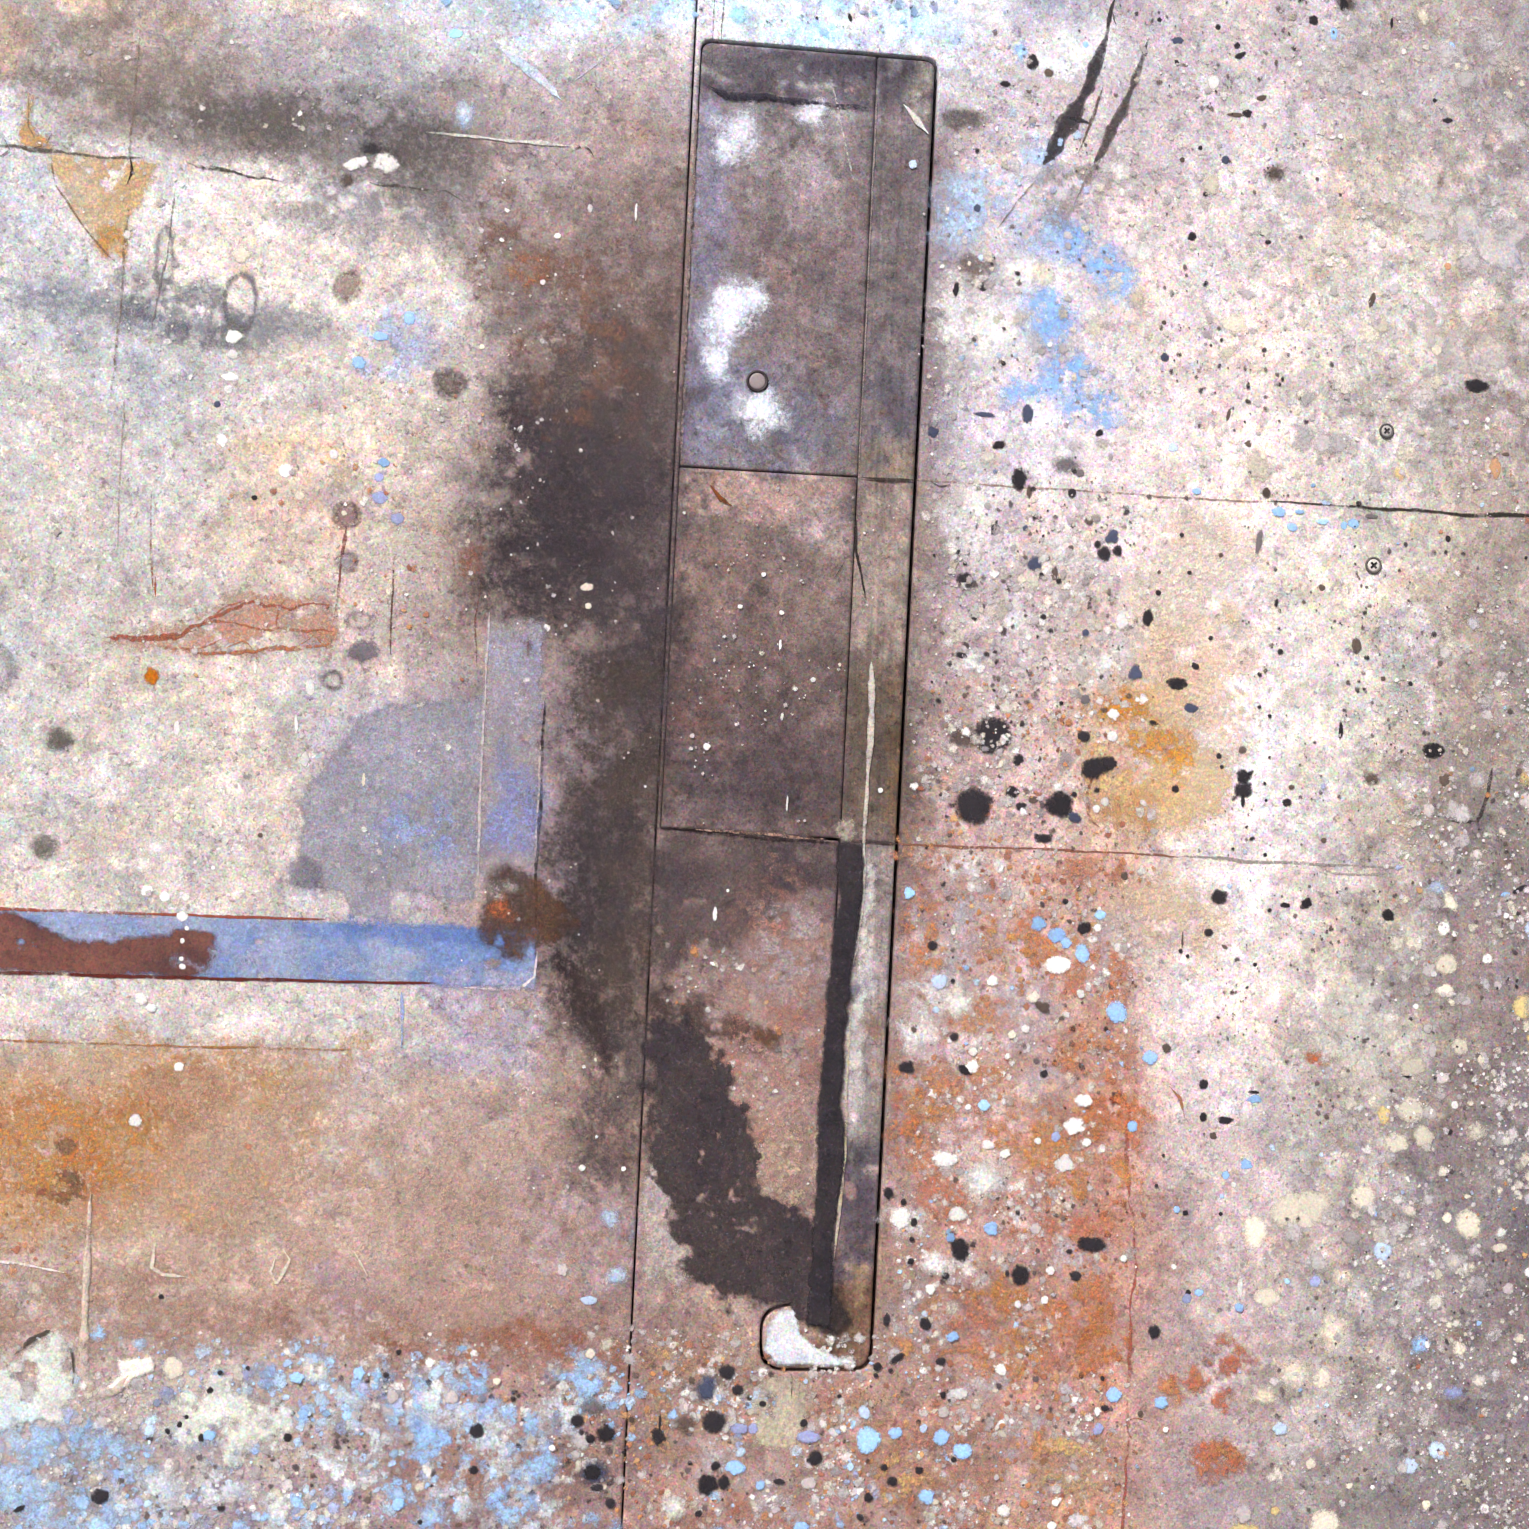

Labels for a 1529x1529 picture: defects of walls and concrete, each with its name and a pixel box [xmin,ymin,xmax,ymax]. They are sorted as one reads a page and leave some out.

rust [473,186,650,422]
damp [434,370,466,399]
crack [861,477,1529,518]
crack [834,520,865,595]
damp [455,307,694,1201]
rust [0,513,1273,1529]
damp [807,1286,852,1335]